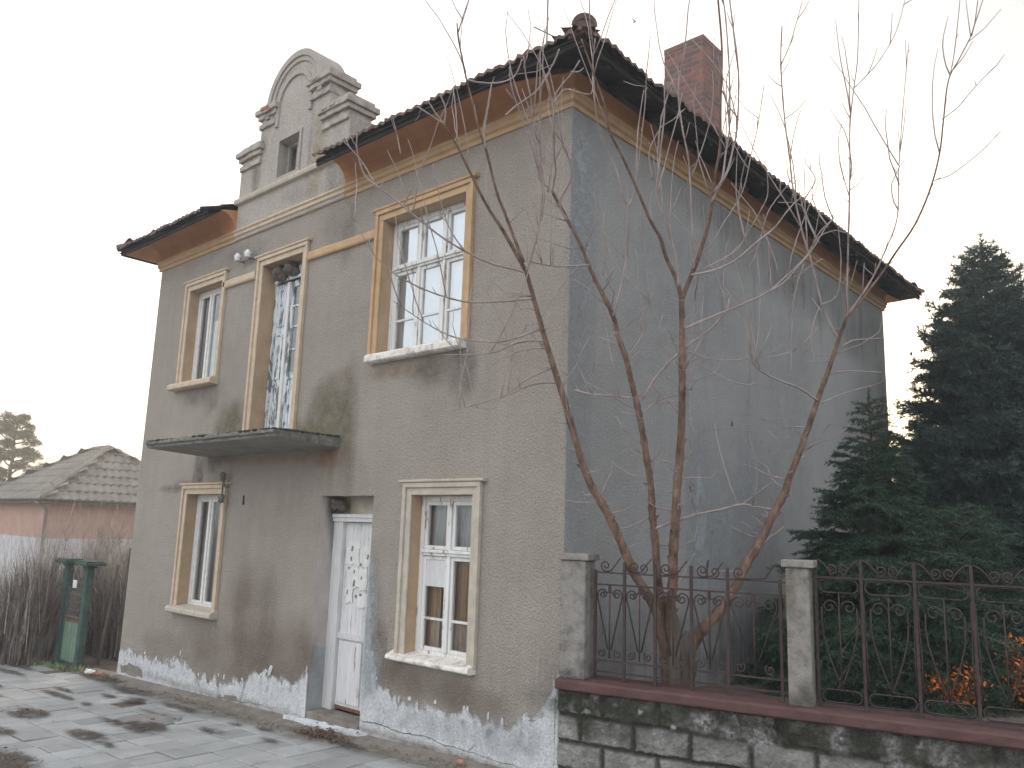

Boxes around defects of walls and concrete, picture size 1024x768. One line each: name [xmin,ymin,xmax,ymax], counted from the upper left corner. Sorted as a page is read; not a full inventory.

peeling [117,648,308,718]
peeling [359,560,559,768]